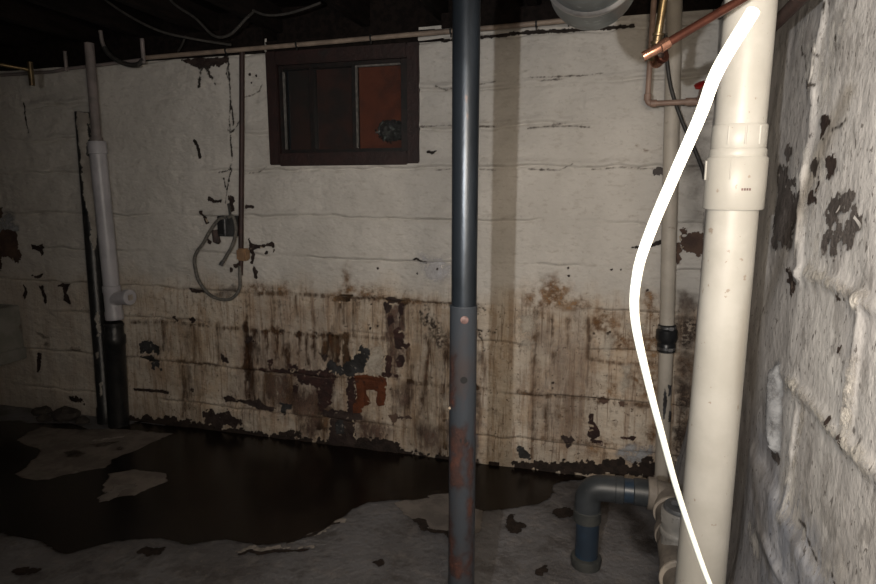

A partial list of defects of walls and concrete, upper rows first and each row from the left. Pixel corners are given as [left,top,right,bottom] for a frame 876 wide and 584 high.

peeling [181,56,229,69]
peeling [821,188,862,262]
peeling [0,229,22,269]
peeling [676,227,704,264]
peeling [259,297,410,446]
leakage [367,347,383,374]
leakage [677,294,696,413]
peeling [202,395,292,429]
leakage [129,371,449,460]
leakage [511,456,655,479]
peeling [587,413,603,446]
leakage [674,426,687,469]